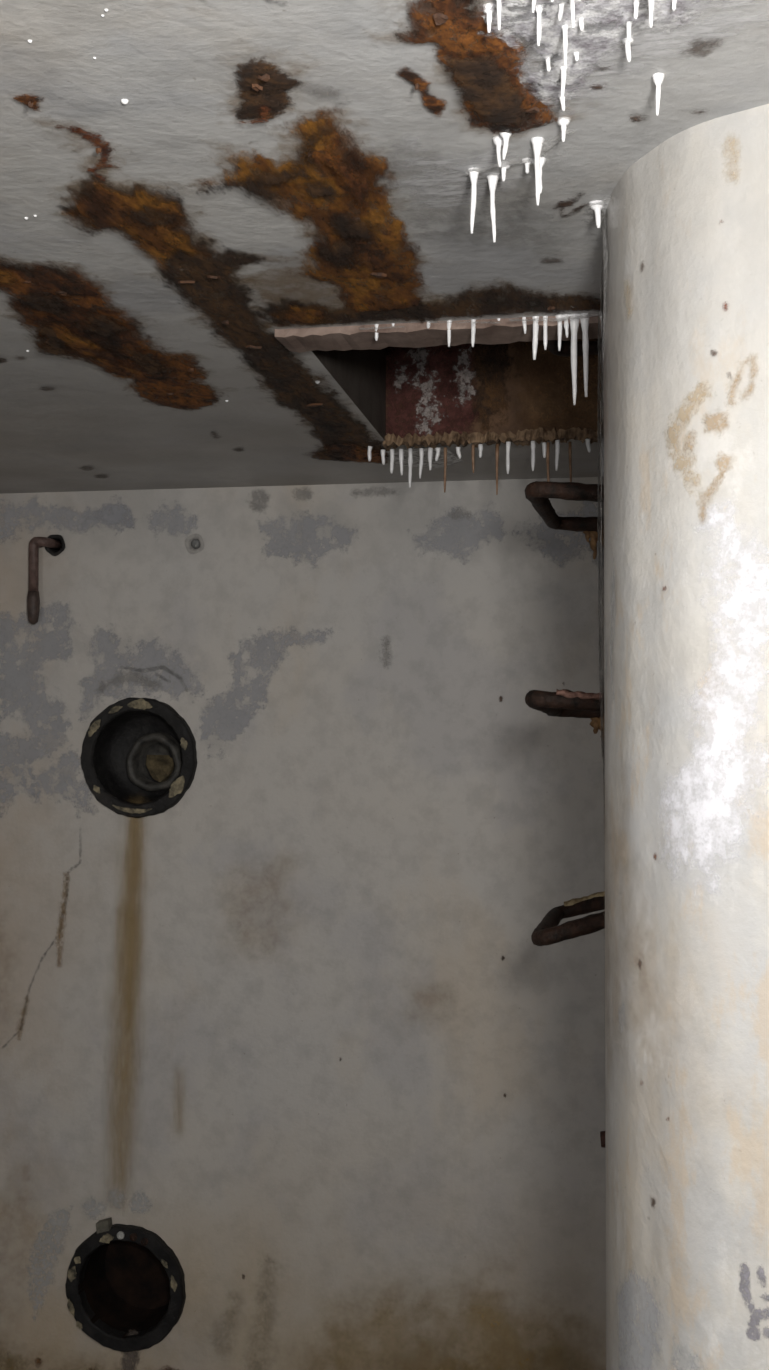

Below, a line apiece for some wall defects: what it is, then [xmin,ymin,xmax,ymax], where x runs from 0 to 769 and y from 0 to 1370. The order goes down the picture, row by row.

rust [14,94,42,110]
rust [395,0,558,134]
damp [402,0,766,243]
rust [57,57,604,463]
rust [0,259,218,410]
damp [706,369,755,430]
damp [661,384,769,891]
peeling [88,698,153,737]
rust [556,682,604,737]
peeling [112,805,151,814]
peeling [169,776,185,798]
crack [45,866,76,965]